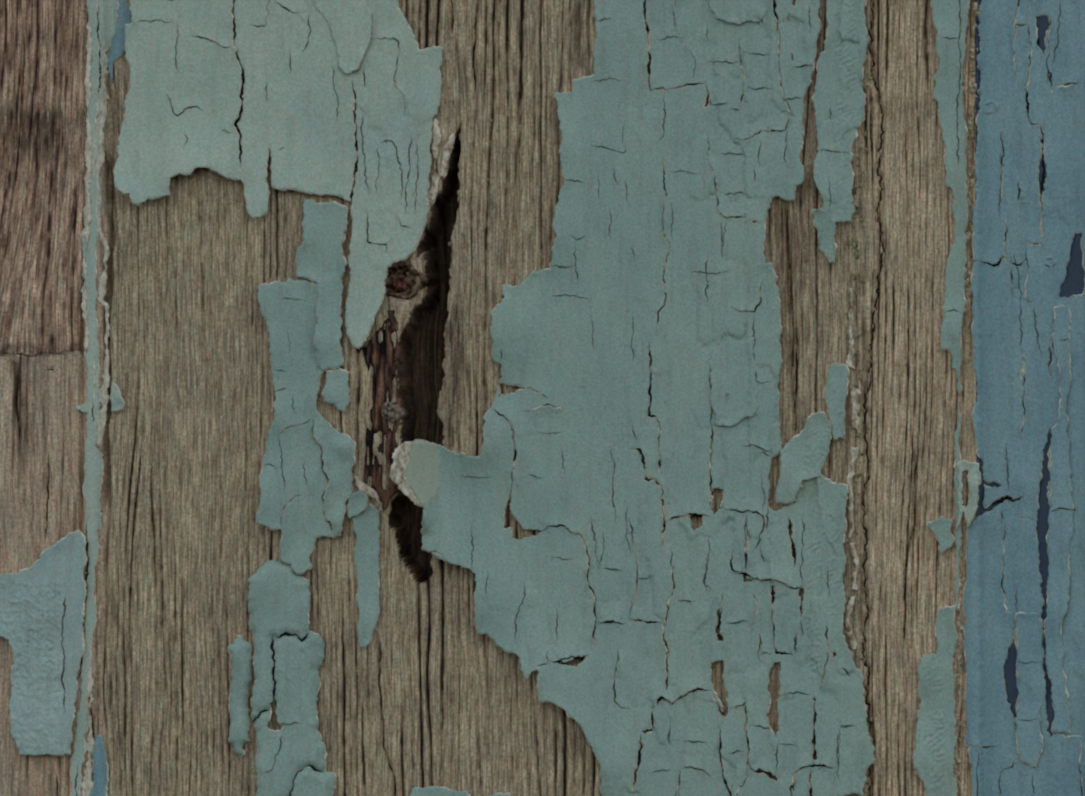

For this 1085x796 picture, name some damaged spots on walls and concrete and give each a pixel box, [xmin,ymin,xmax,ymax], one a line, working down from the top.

crack [135,0,311,162]
crack [331,62,419,248]
crack [451,0,476,87]
crack [941,0,962,165]
crack [970,0,1071,358]
peeling [0,0,455,796]
crack [460,404,565,479]
peeling [389,0,876,796]
crack [540,0,885,796]
crack [993,377,1025,609]
crack [514,582,526,639]
crack [976,747,1034,796]